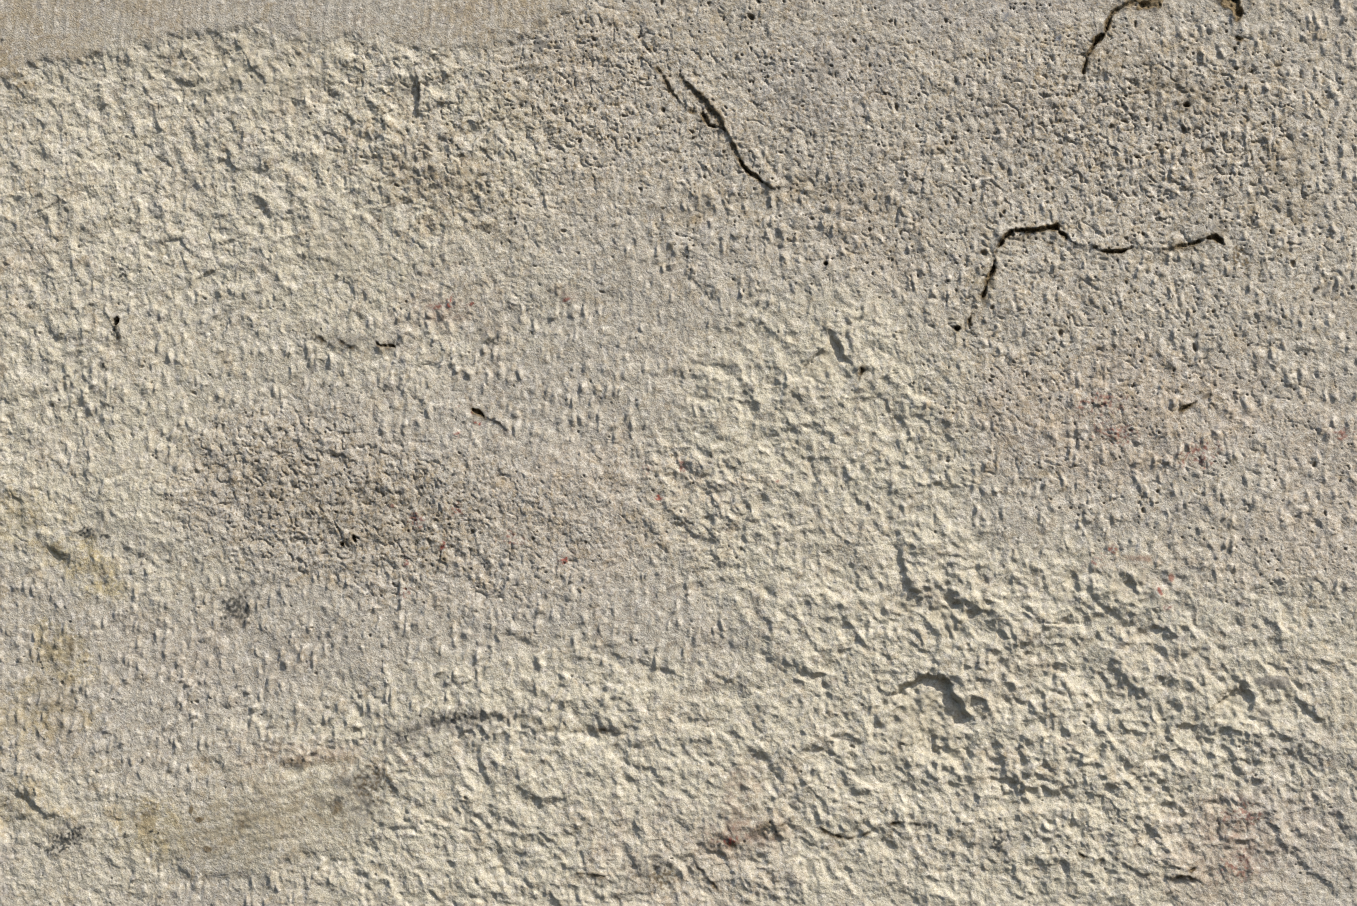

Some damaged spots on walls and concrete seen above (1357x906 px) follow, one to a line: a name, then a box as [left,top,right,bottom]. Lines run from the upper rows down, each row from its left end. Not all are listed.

crack [1081,0,1163,74]
crack [1220,0,1244,41]
crack [655,67,768,186]
crack [967,222,1131,325]
crack [1175,233,1223,248]